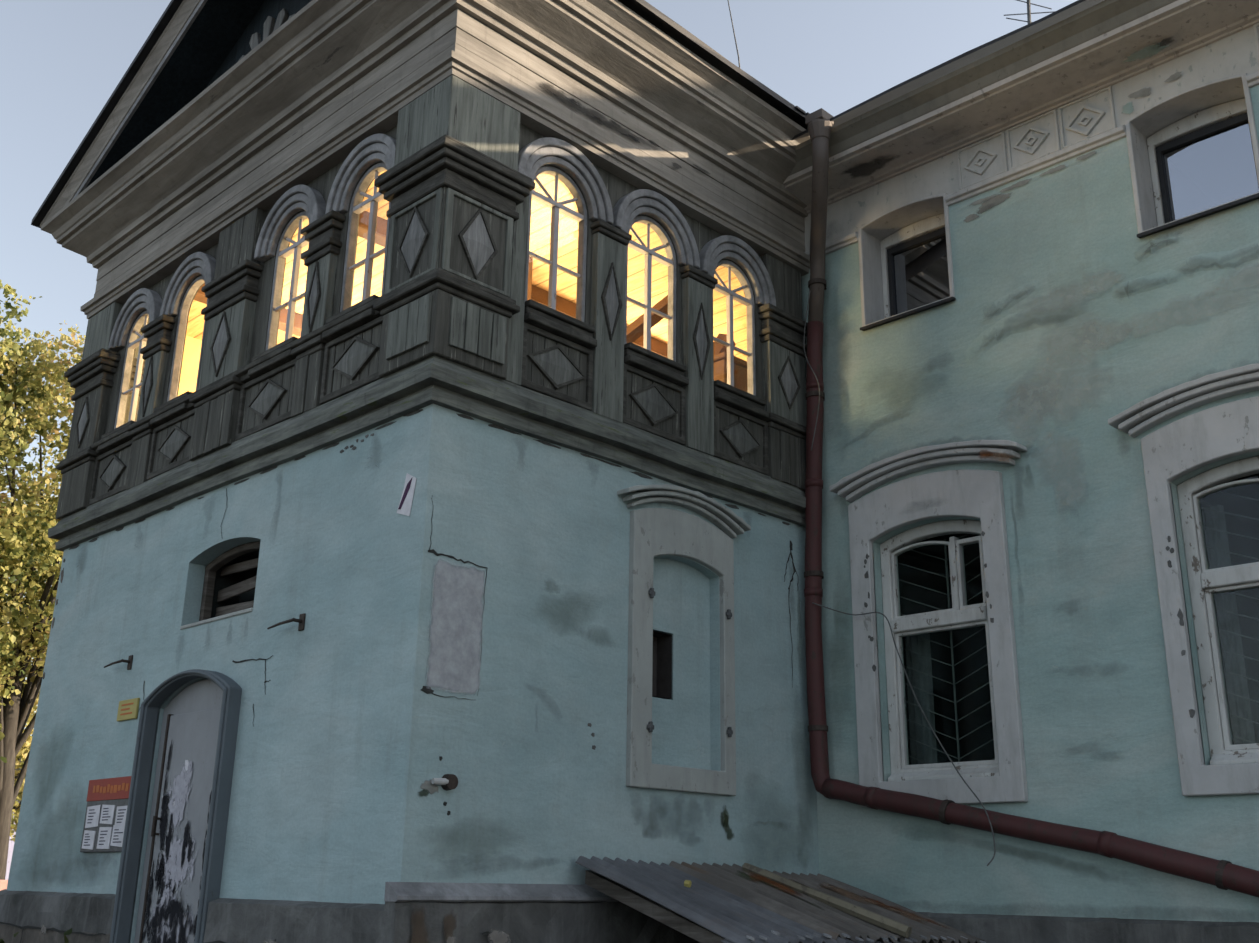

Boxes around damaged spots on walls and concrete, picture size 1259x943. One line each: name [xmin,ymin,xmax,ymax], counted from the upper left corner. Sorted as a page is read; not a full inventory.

crack [784,541,798,688]
peeling [142,741,226,943]
damp [724,814,733,839]